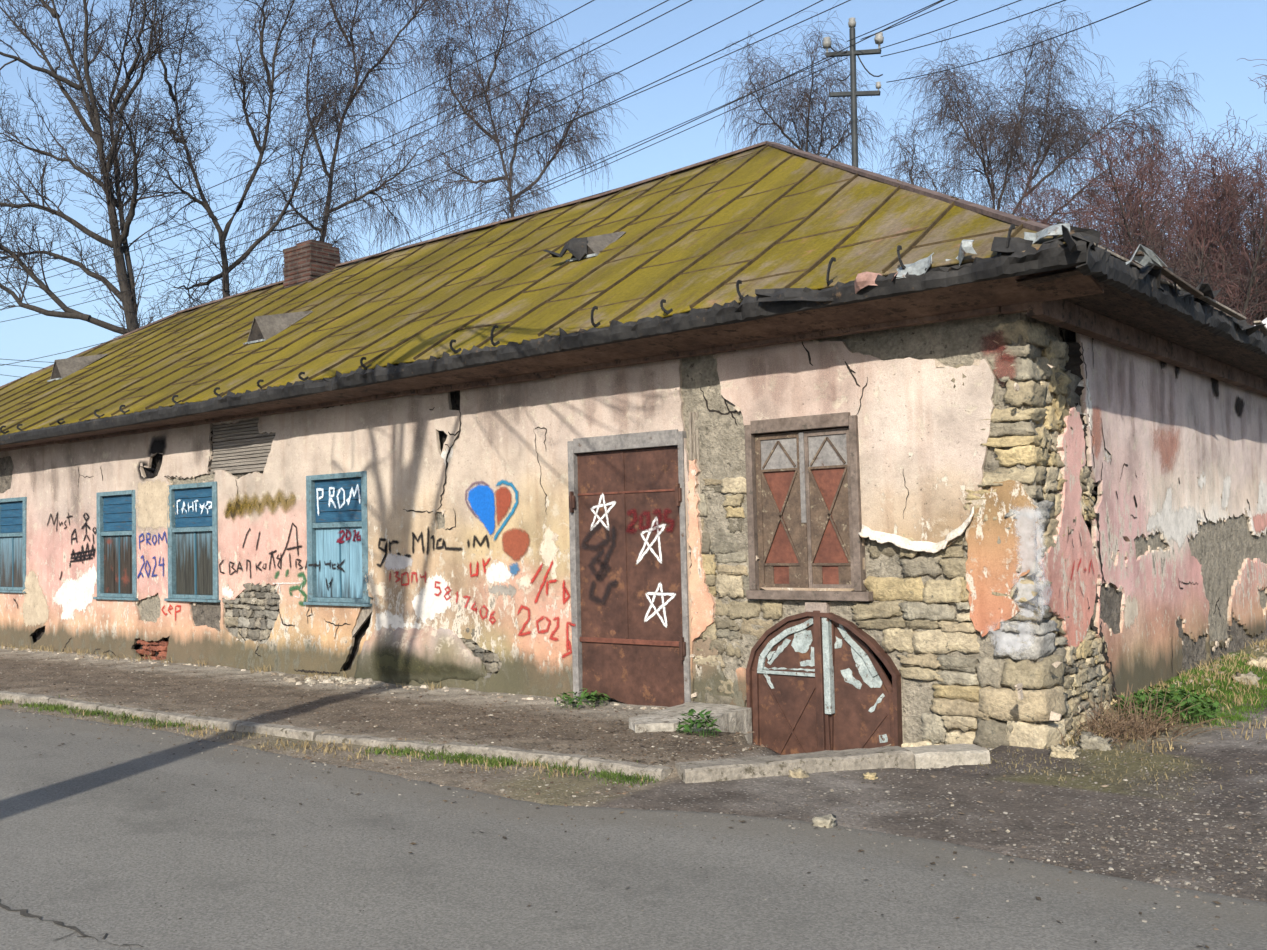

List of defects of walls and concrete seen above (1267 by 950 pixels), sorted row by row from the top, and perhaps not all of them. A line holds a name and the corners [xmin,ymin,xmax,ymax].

flaking render [0,456,14,494]
flaking render [135,417,275,531]
crack [403,407,461,530]
flaking render [681,312,1267,751]
crack [1059,329,1137,701]
flaking render [136,594,161,624]
flaking render [136,637,169,660]
flaking render [190,581,281,644]